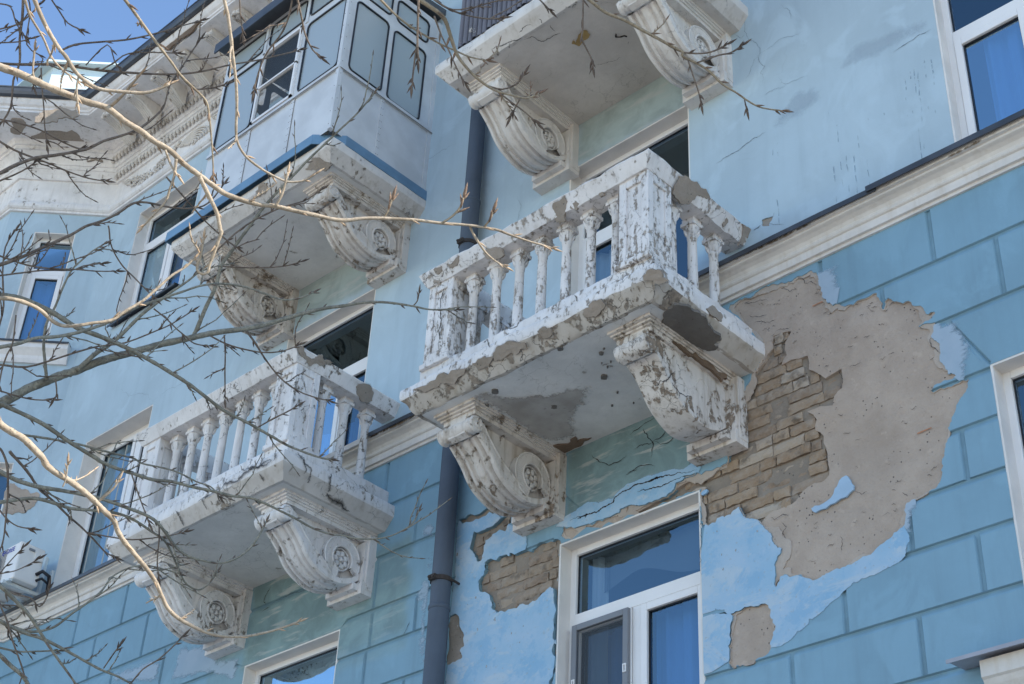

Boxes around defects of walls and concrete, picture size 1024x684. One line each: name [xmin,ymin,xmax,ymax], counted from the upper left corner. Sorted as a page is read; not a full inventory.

spalling [671,175,710,205]
spalling [552,195,579,222]
spalling [433,256,459,274]
spalling [483,247,506,260]
spalling [414,341,528,393]
spalling [356,383,374,403]
crack [571,418,692,520]
peeling [445,268,969,684]